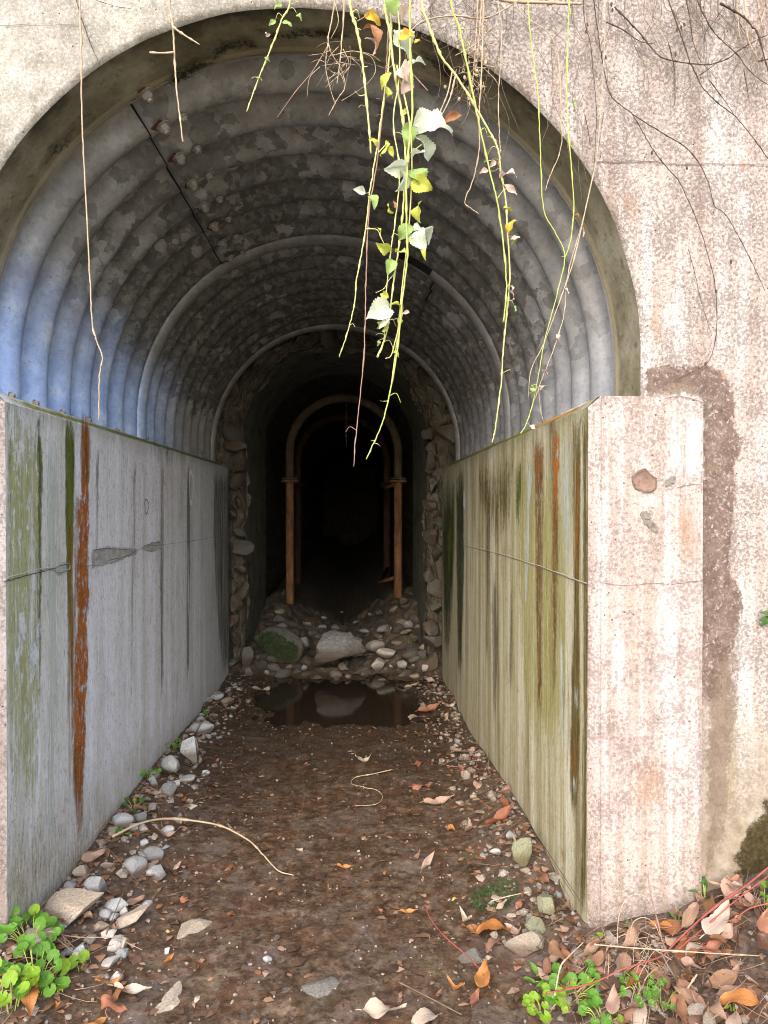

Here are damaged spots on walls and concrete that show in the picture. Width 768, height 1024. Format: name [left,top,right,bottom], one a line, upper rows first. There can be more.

rust [71,418,98,833]
crack [4,535,221,583]
water stain [456,471,464,666]
water stain [486,585,512,708]
rust [532,405,581,707]
rust [570,428,580,807]
water stain [562,425,588,905]
crack [463,544,710,588]
spalling [640,511,659,533]
spalling [632,468,676,493]
water stain [645,364,743,875]